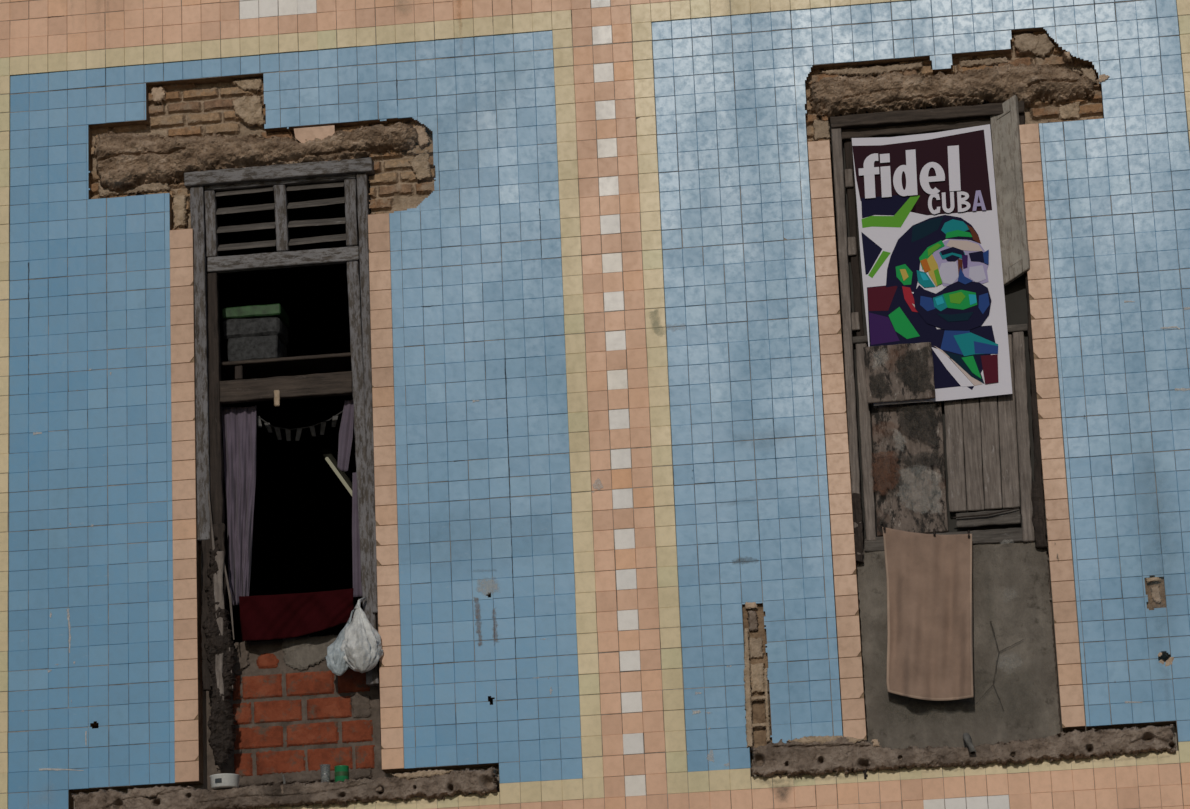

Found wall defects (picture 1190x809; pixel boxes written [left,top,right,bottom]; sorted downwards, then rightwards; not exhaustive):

flaking render [88,73,436,230]
flaking render [805,27,1179,751]
spalling [69,783,179,809]
spalling [405,763,499,772]
peeling [742,602,772,777]